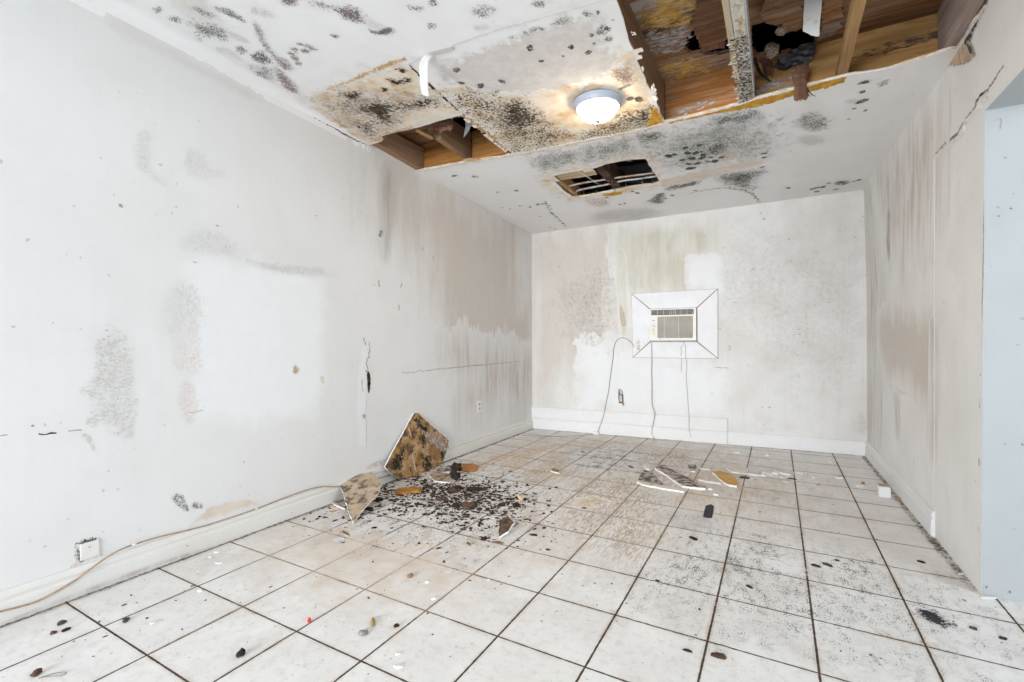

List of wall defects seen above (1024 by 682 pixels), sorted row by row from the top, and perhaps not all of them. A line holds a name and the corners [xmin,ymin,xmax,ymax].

peeling [636,0,794,127]
peeling [807,77,847,92]
crack [935,64,1004,157]
water stain [103,0,950,650]
crack [362,340,371,449]